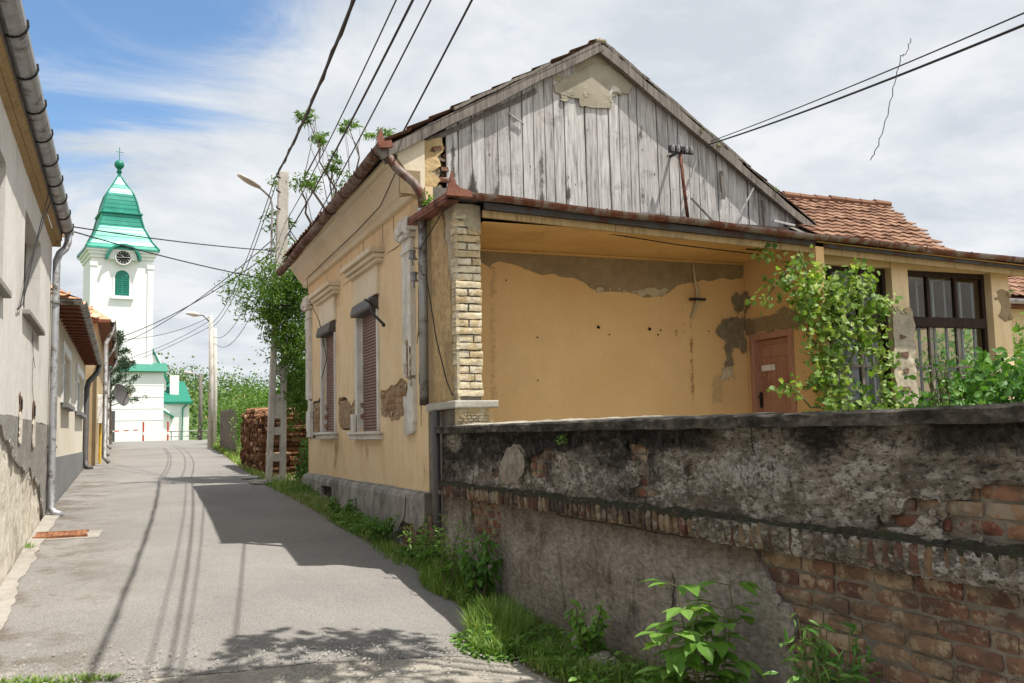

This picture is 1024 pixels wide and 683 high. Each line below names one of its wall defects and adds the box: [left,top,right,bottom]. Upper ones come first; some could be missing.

peeling [553,62,633,109]
spalling [424,138,449,188]
peeling [479,251,743,298]
peeling [745,307,808,335]
flaking render [381,340,412,421]
spalling [893,306,919,407]
flaking render [313,400,365,436]
flaking render [873,480,1024,545]